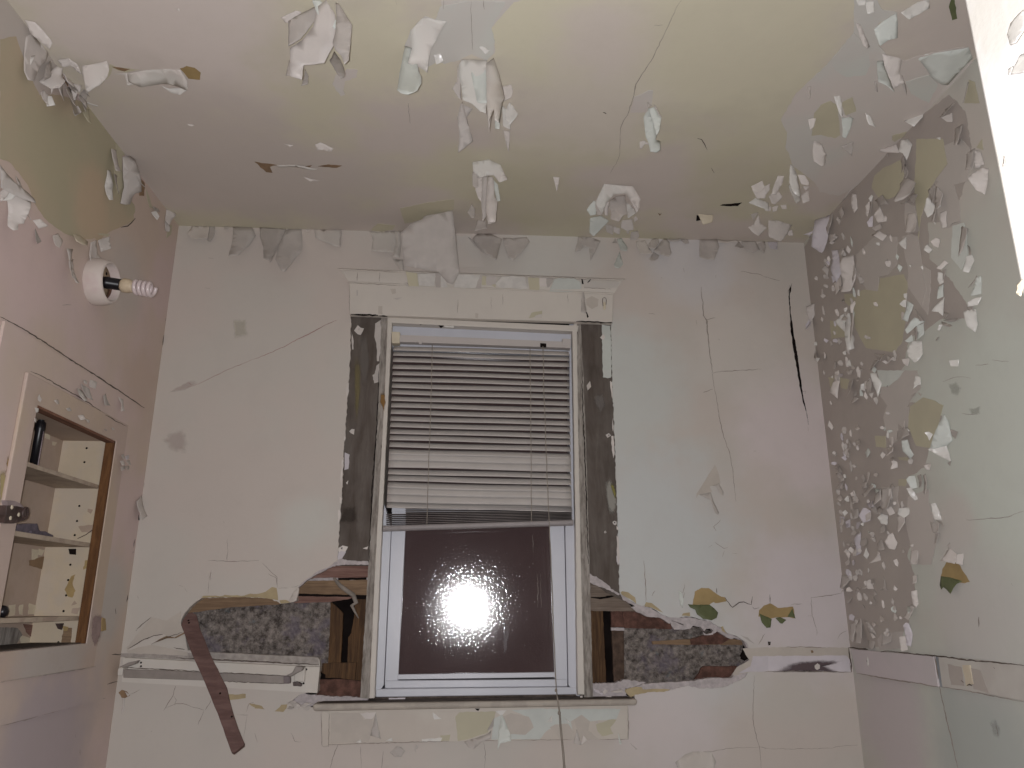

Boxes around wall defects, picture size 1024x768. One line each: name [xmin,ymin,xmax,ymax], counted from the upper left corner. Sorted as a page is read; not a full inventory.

peeling [0,20,201,283]
peeling [255,142,341,181]
peeling [281,0,358,96]
peeling [397,0,521,152]
peeling [370,159,619,318]
crack [603,1,681,173]
crack [188,268,436,387]
spalling [352,306,383,383]
crack [742,271,809,425]
peeling [575,0,989,667]
flaking render [188,546,393,744]
flaking render [422,574,753,749]